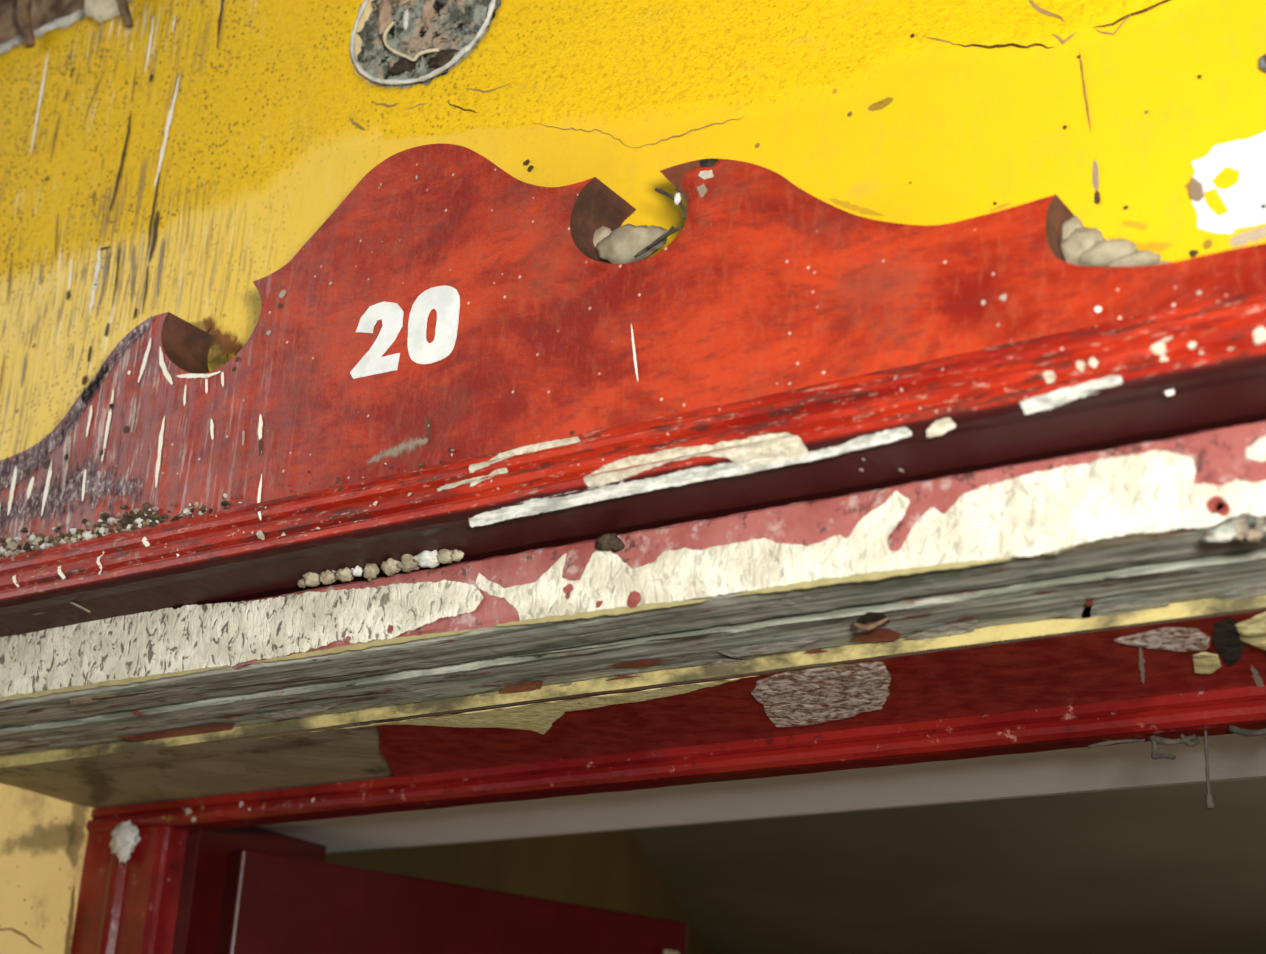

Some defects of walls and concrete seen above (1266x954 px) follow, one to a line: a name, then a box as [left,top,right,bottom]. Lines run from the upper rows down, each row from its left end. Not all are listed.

spalling [350,0,501,89]
crack [927,0,1170,49]
peeling [1187,131,1266,246]
peeling [1020,357,1123,414]
peeling [1150,336,1173,362]
peeling [1253,325,1266,345]
peeling [469,418,956,528]
peeling [1245,436,1266,462]
peeling [0,450,1266,697]
peeling [266,660,891,738]